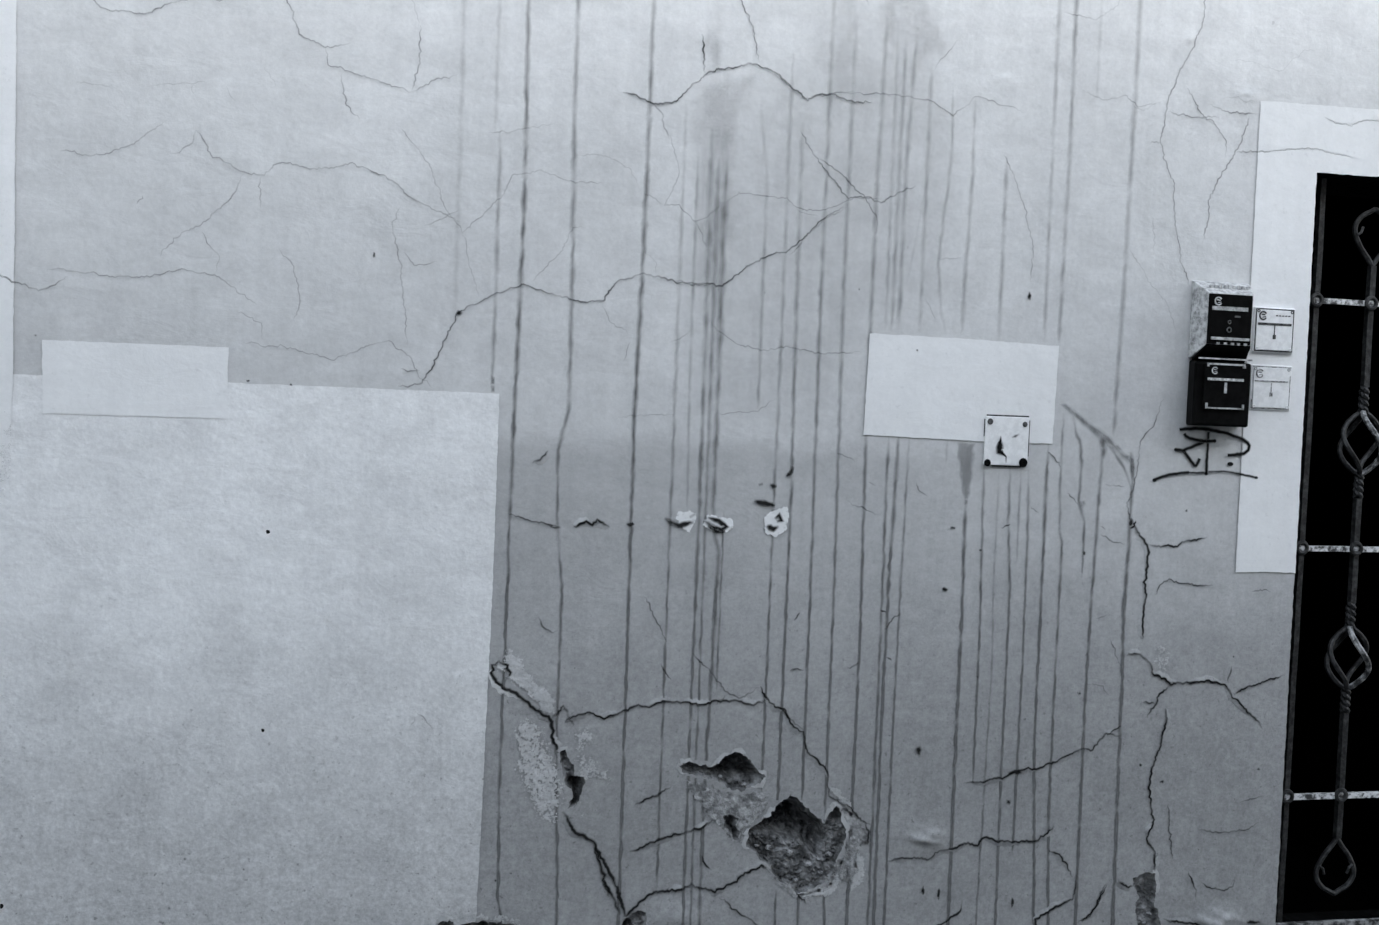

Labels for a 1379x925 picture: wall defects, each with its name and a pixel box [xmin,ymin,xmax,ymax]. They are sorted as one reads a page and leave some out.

crack [628,0,874,105]
crack [405,278,629,387]
crack [662,218,825,287]
peeling [497,648,611,826]
leakage [617,282,643,925]
spalling [676,748,868,899]
peeling [764,506,789,537]
crack [488,417,1279,925]
leakage [867,458,906,925]
leakage [946,515,983,925]
leakage [978,464,1062,925]
spalling [1132,869,1161,925]